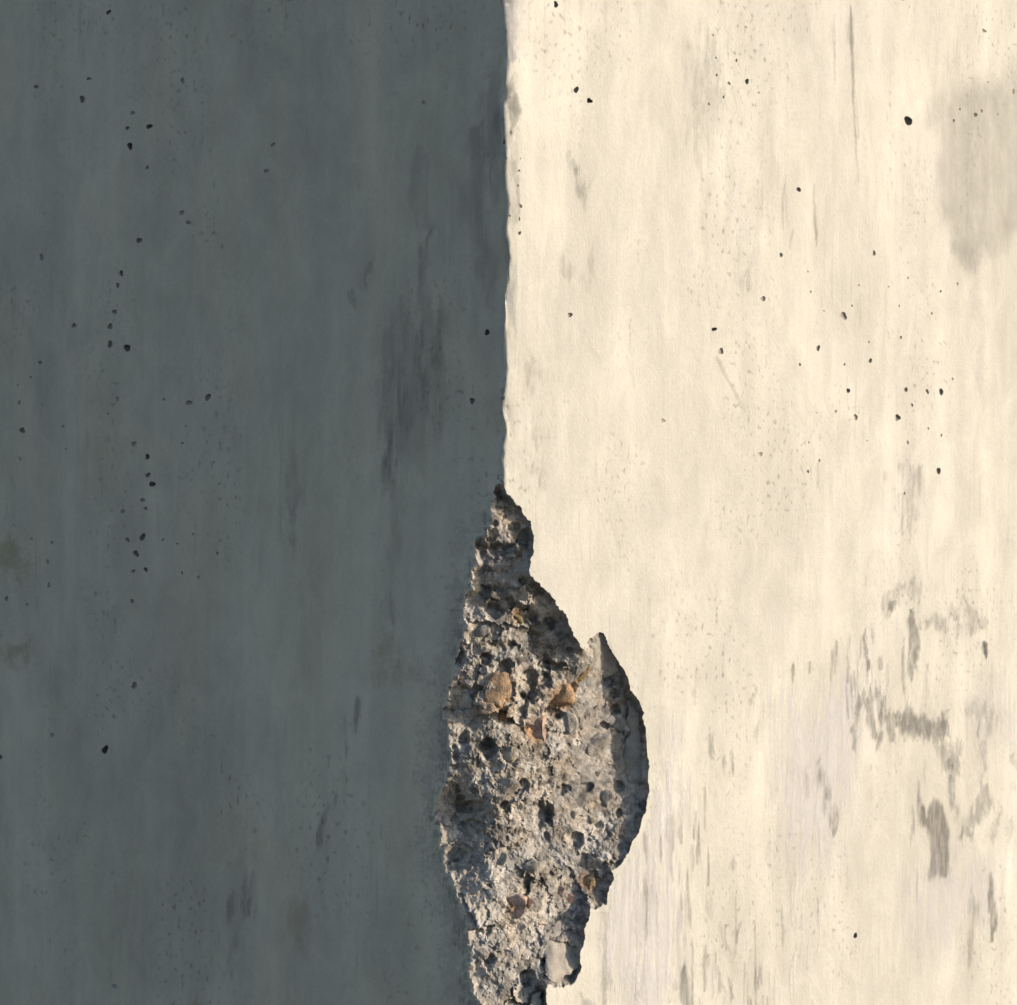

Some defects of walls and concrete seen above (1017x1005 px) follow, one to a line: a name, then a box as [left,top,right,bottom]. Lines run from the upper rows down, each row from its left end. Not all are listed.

spalling [429,476,650,1005]
leakage [922,806,948,875]